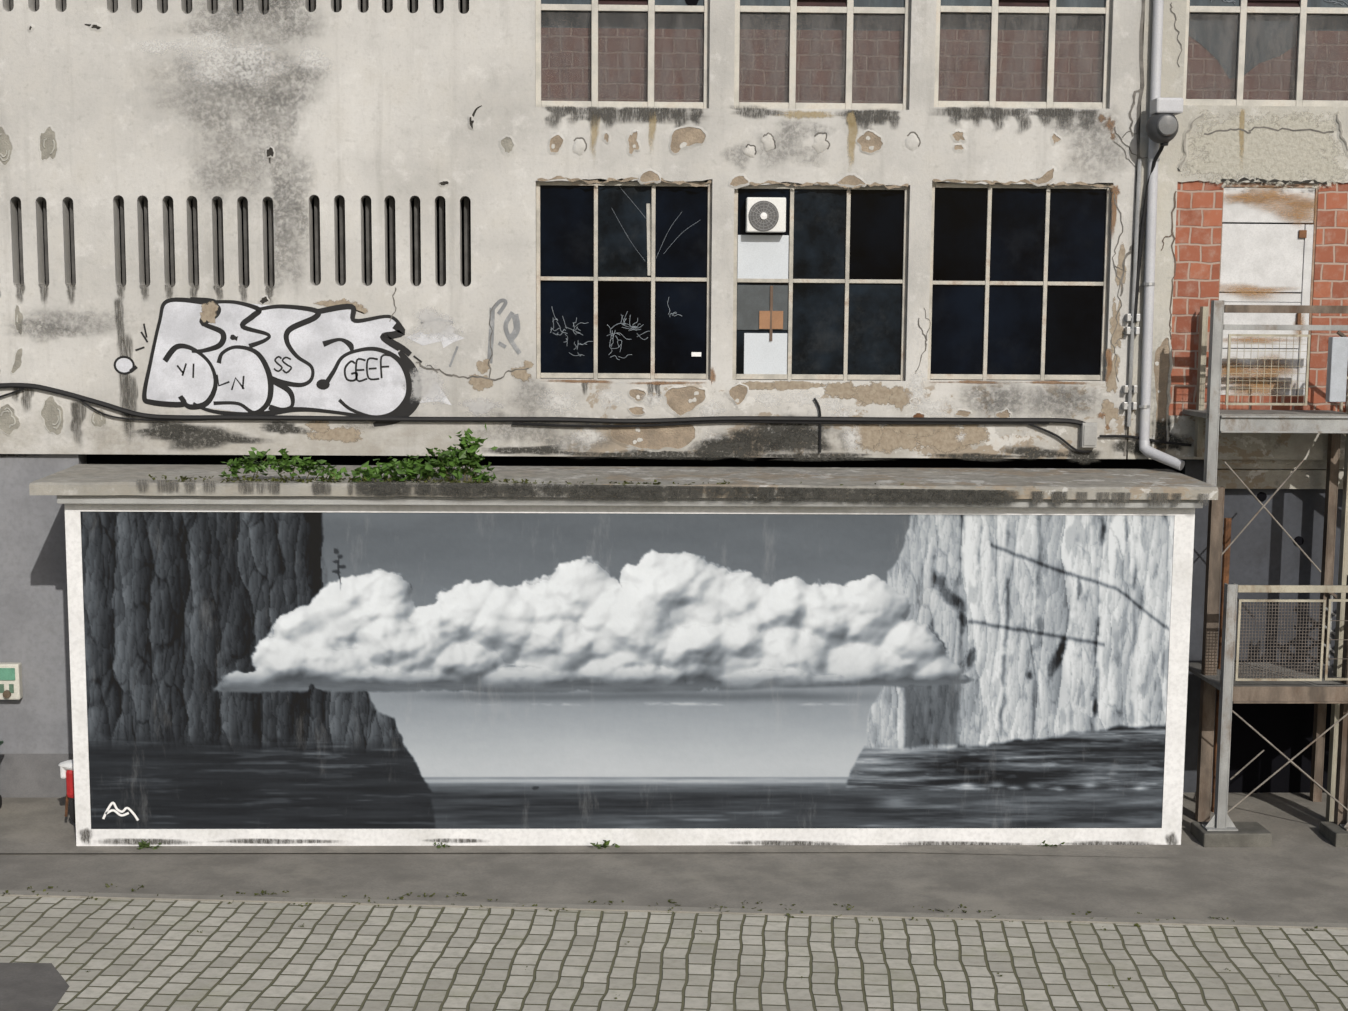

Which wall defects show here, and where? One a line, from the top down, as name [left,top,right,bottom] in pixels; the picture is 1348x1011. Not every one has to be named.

water stain [947,107,1096,129]
spalling [547,132,566,155]
spalling [601,129,641,157]
spalling [668,124,709,156]
spalling [855,129,886,155]
spalling [538,168,712,187]
spalling [727,173,909,189]
crack [1111,0,1182,456]
crack [416,303,529,381]
flaking render [577,375,1012,454]